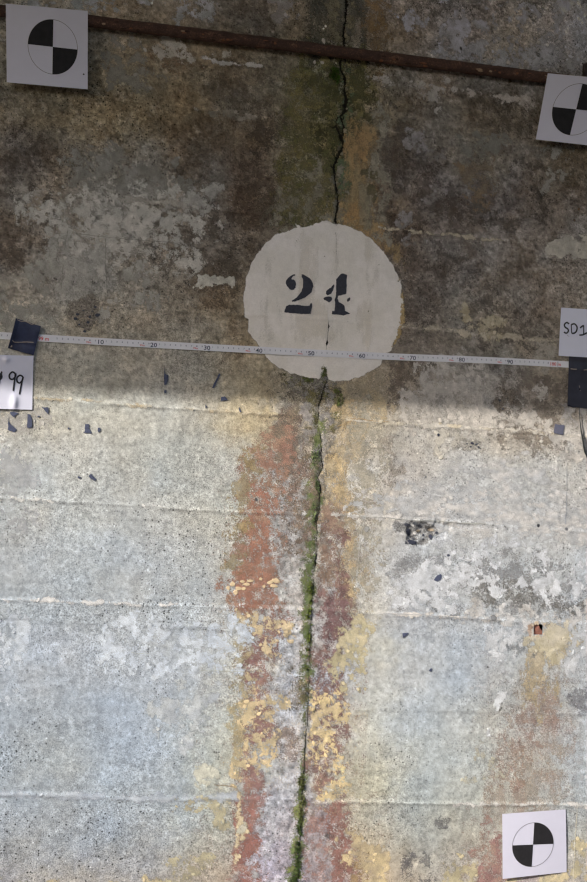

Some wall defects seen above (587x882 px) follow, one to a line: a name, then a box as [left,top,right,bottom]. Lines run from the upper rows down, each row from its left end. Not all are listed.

crack [330,0,349,226]
crack [295,381,492,882]